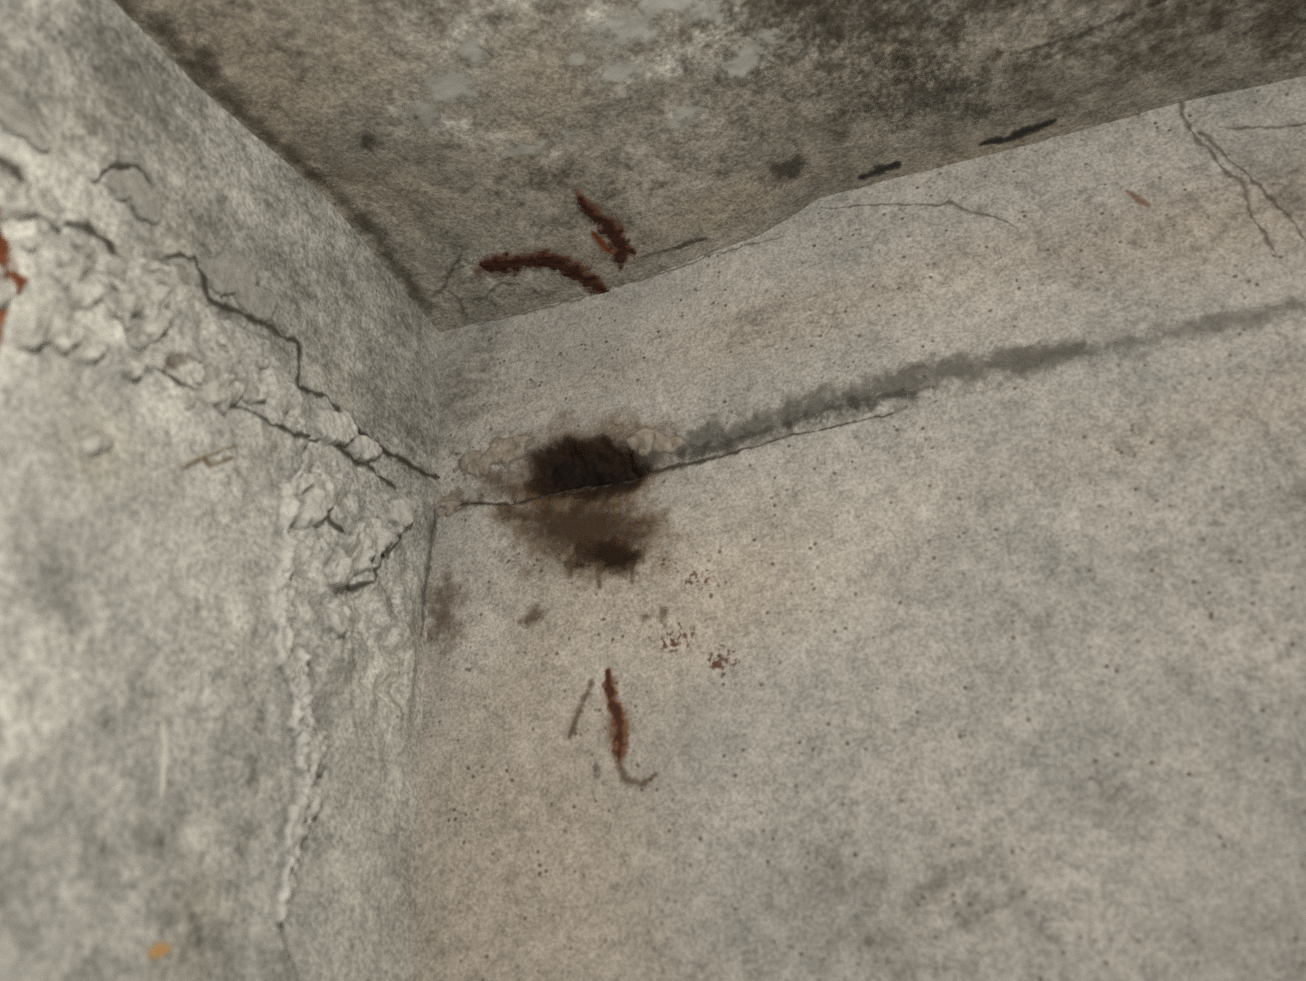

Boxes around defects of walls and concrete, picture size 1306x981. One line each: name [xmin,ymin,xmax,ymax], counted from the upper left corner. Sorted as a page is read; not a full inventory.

leakage [566,0,724,87]
leakage [717,28,781,79]
rust [0,208,29,295]
crack [63,220,119,255]
rust [480,248,610,295]
rust [577,195,636,269]
crack [166,251,440,488]
leakage [554,421,654,482]
crack [461,412,894,505]
crack [347,521,401,592]
leakage [495,459,658,588]
rust [568,668,657,786]